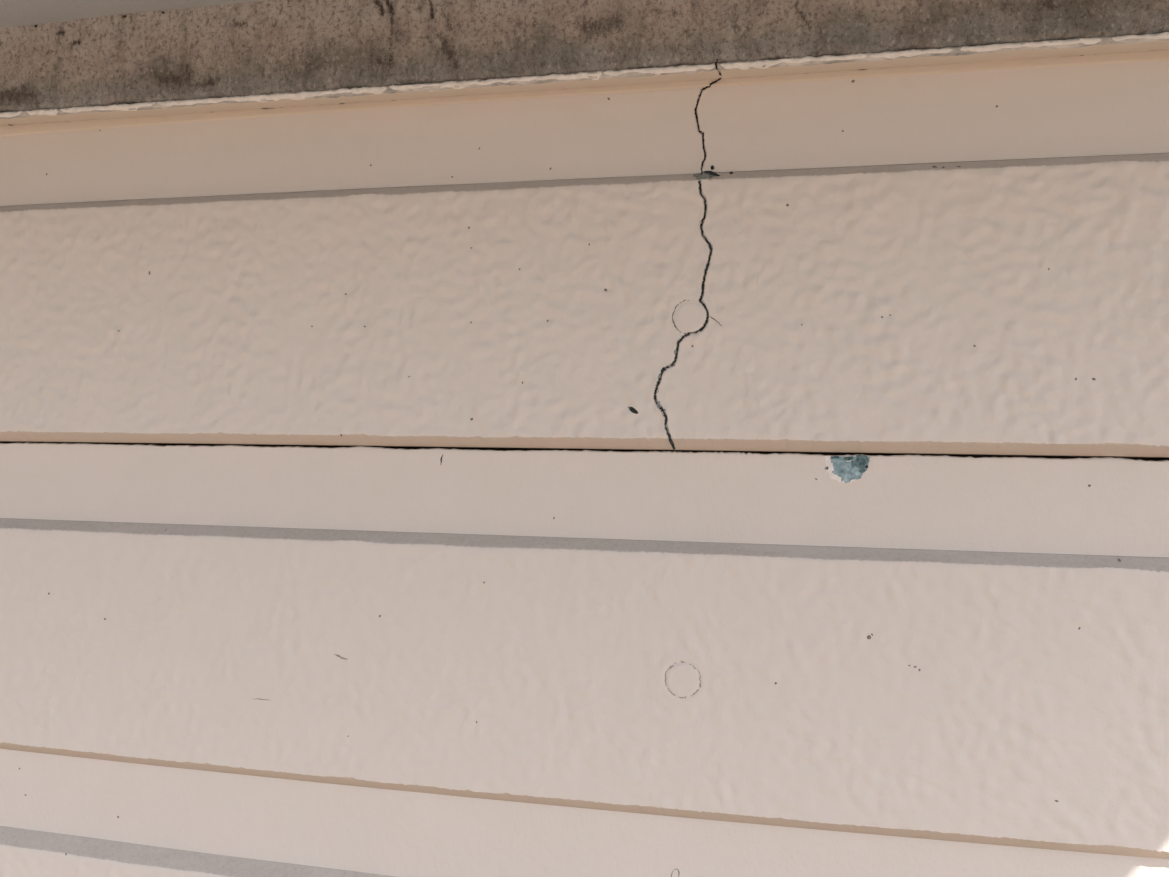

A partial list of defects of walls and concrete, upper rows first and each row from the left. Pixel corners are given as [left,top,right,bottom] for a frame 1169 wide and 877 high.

crack [654,59,722,450]
peeling [825,454,870,483]